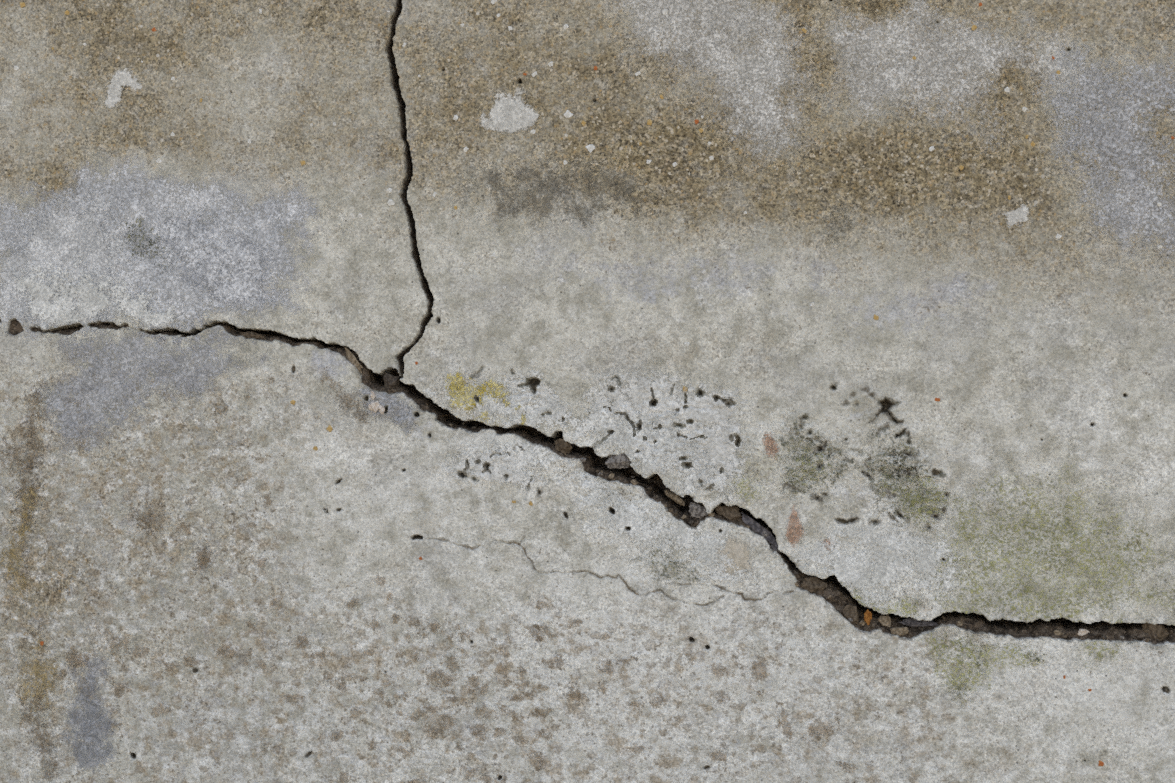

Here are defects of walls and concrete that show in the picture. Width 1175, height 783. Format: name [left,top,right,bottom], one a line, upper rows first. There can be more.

crack [6,318,24,337]
crack [385,0,434,379]
crack [29,321,1175,646]